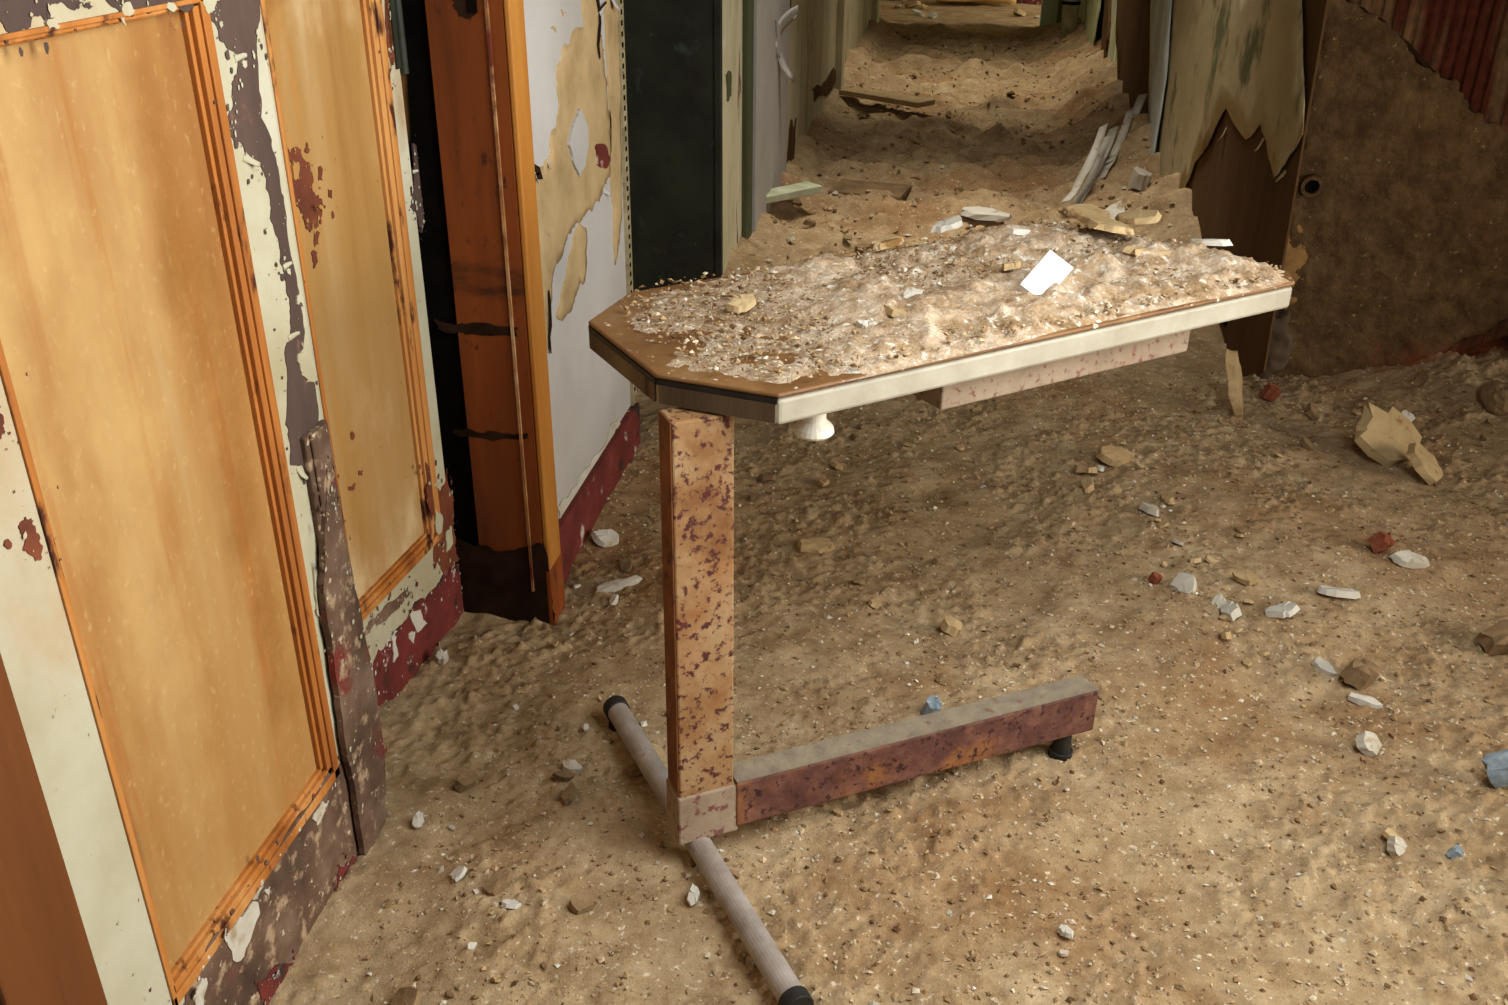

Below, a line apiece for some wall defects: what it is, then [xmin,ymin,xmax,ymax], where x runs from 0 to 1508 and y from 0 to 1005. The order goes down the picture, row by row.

flaking render [535,0,622,353]
peeling [1083,0,1329,377]
peeling [0,0,416,1005]
peeling [419,460,458,587]
flaking render [435,643,449,665]